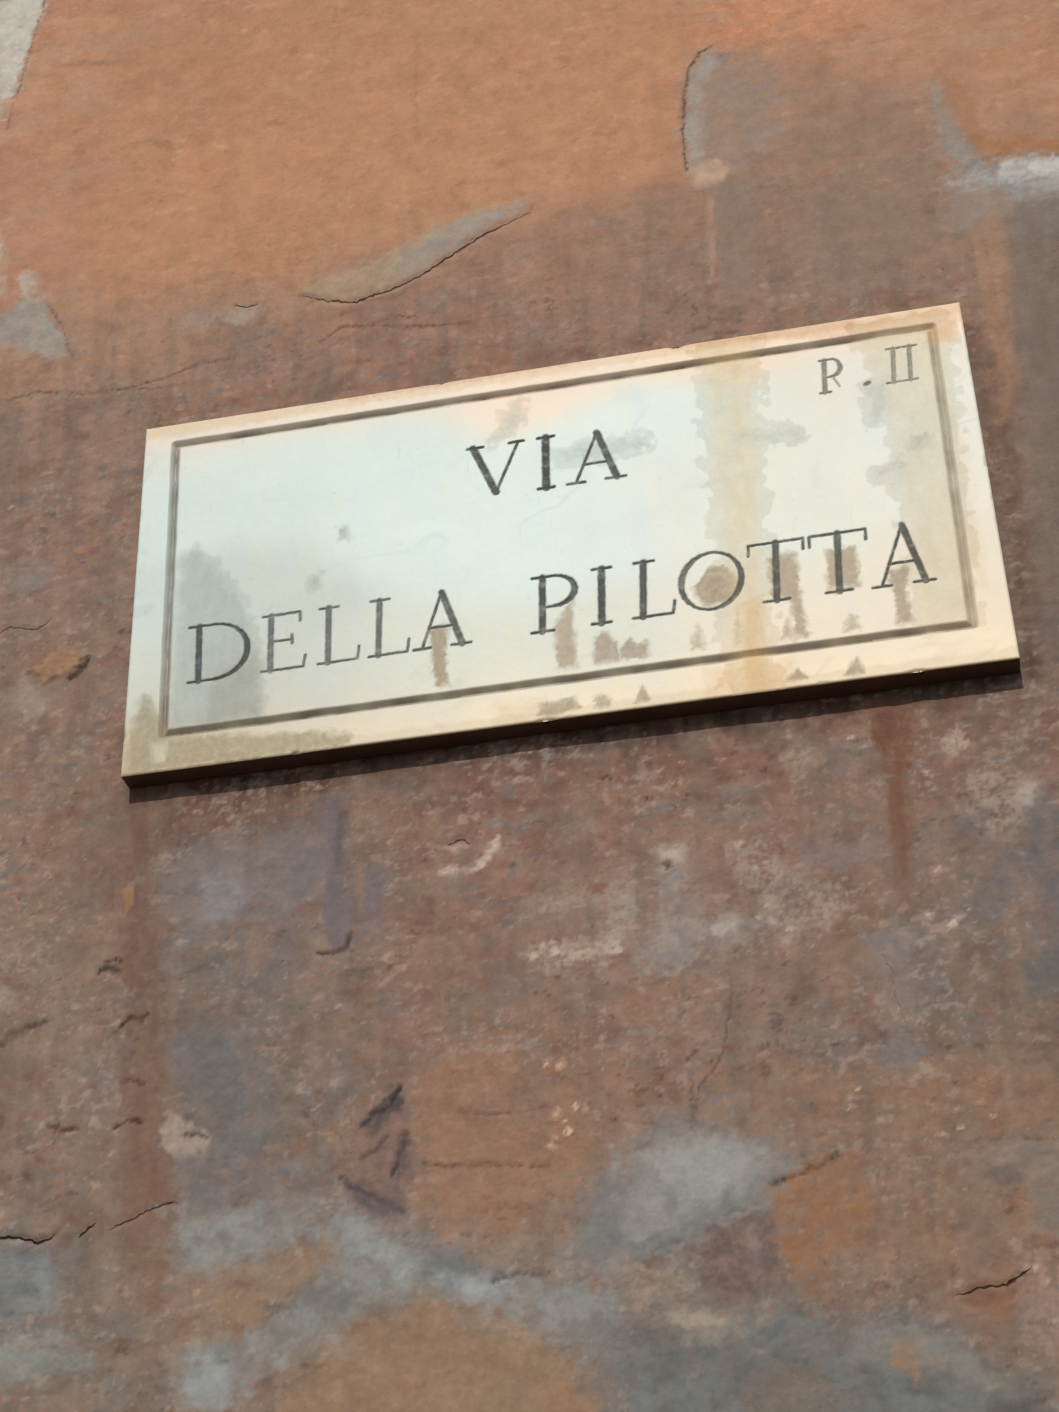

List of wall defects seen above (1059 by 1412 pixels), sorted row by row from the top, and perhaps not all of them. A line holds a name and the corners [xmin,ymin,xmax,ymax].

flaking render [0,0,61,131]
flaking render [0,225,78,364]
damp [692,162,945,318]
flaking render [0,643,94,731]
crack [0,1201,175,1244]